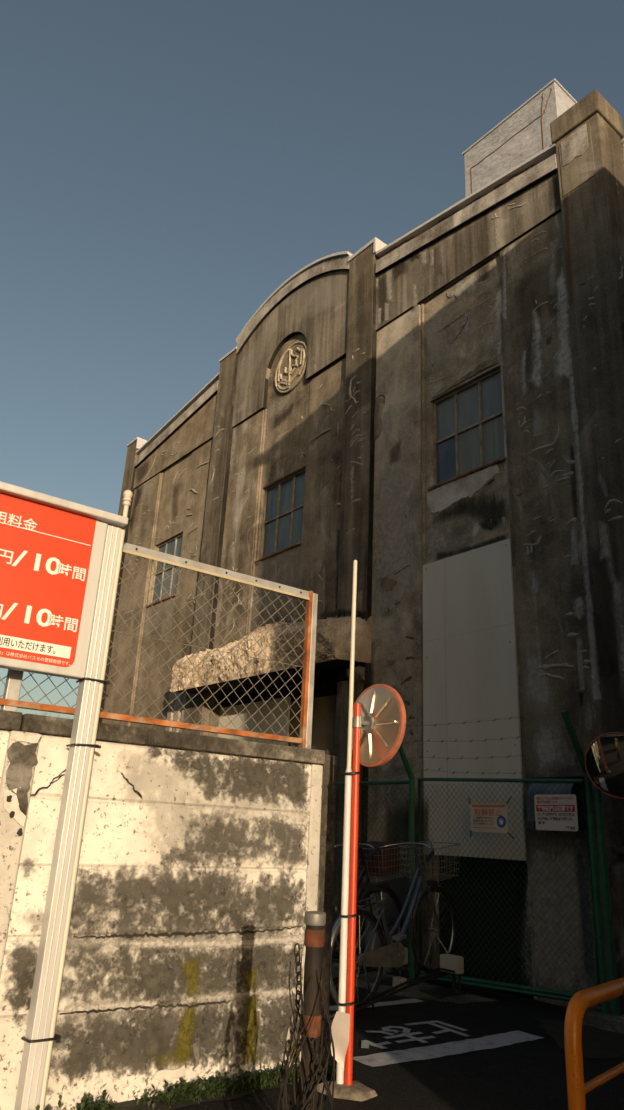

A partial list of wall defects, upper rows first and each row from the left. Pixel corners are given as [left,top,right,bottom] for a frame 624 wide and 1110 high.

leakage [428,498,506,559]
spalling [3,733,42,828]
crack [30,769,66,796]
crack [121,772,142,798]
leakage [137,730,311,807]
leakage [318,754,335,911]
leakage [51,815,305,1082]